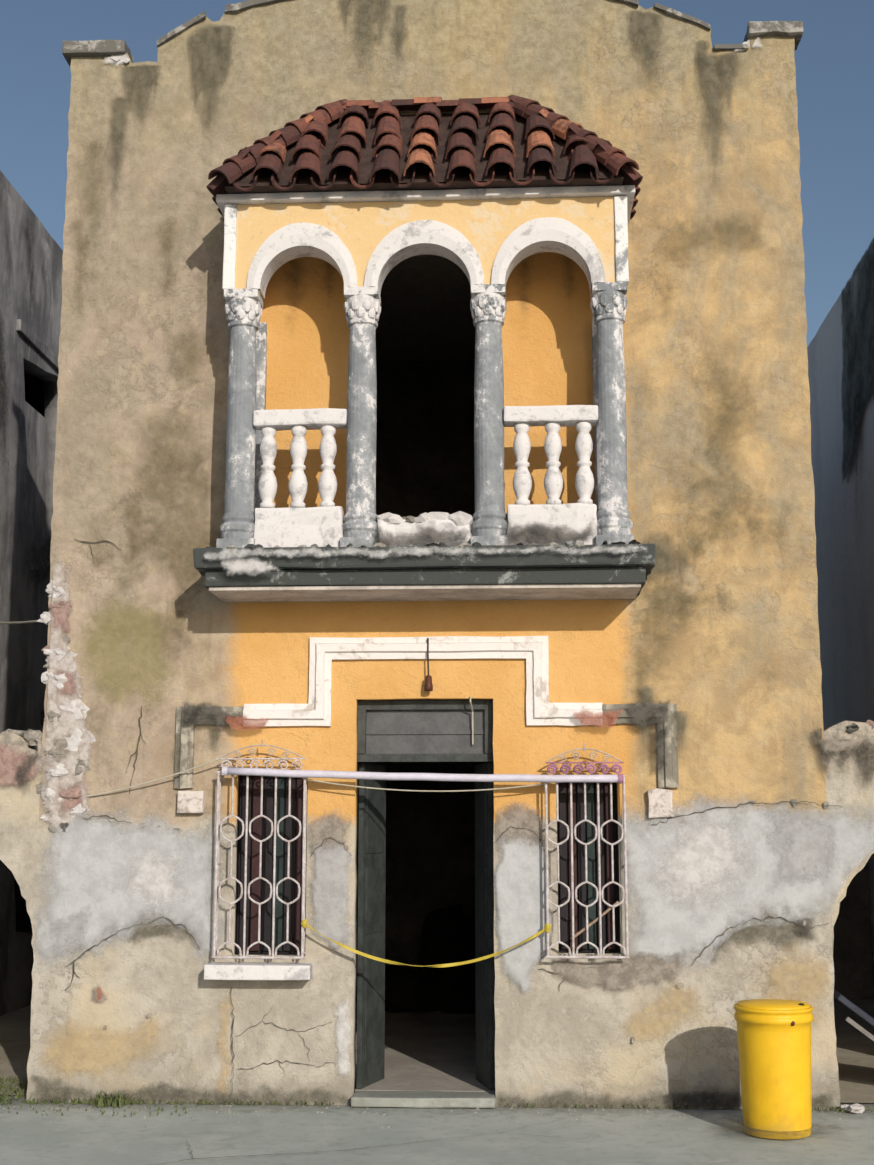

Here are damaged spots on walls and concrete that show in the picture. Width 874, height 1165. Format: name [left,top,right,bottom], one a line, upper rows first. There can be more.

water stain [112,65,158,170]
water stain [190,26,231,117]
water stain [340,0,405,51]
water stain [697,40,737,140]
flaking render [0,539,221,967]
crack [126,706,146,793]
flaking render [496,799,874,991]
crack [235,1008,350,1074]